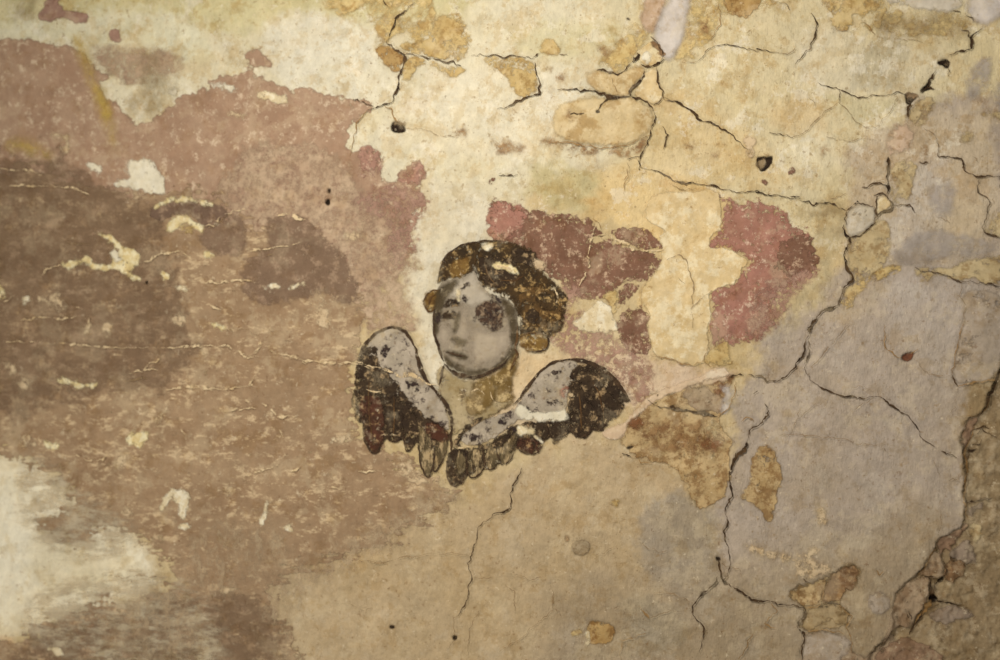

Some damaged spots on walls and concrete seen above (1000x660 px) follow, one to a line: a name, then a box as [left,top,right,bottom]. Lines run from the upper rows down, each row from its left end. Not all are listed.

peeling [323,0,472,80]
peeling [485,55,537,97]
peeling [540,39,560,55]
peeling [674,0,776,60]
peeling [61,234,141,281]
peeling [166,215,203,234]
peeling [486,201,528,240]
crack [350,0,1000,659]
spalling [620,378,733,509]
peeling [741,445,783,522]
spalling [841,374,1000,660]
spalling [789,564,861,632]